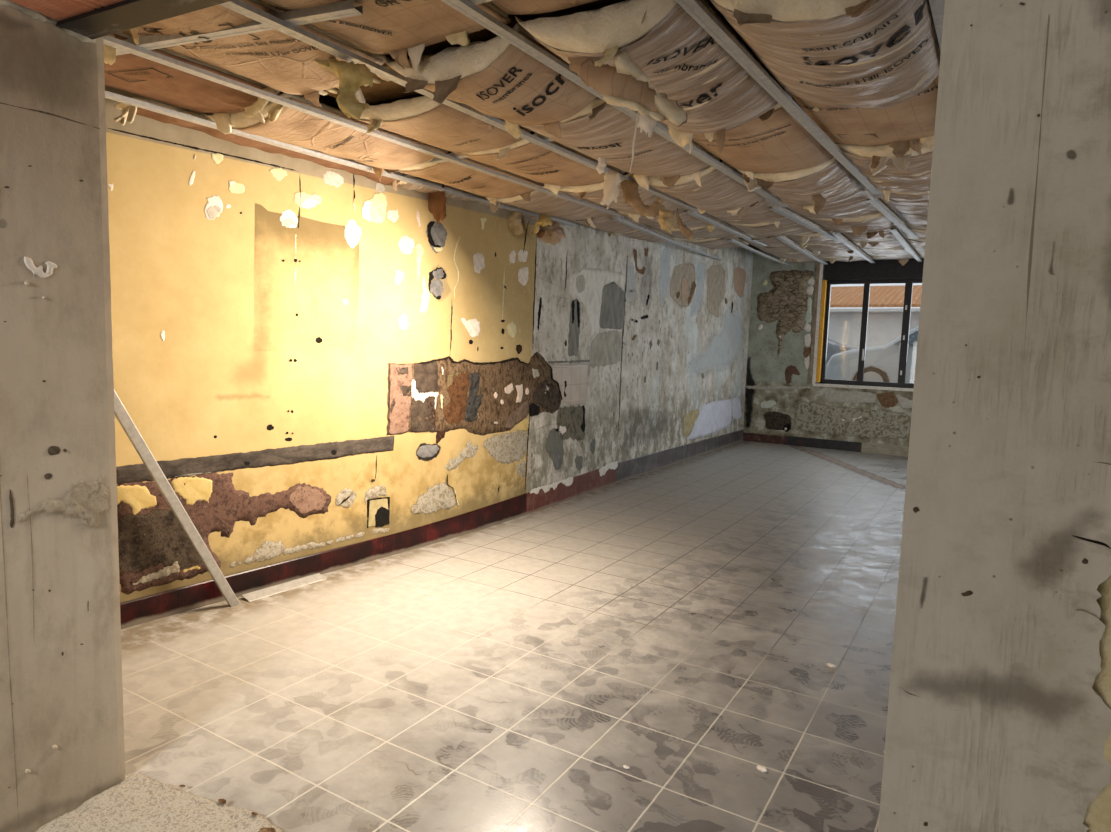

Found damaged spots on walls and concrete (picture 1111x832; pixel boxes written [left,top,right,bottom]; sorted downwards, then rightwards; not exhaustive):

peeling [269,167,287,181]
peeling [279,191,322,228]
peeling [345,183,399,248]
peeling [398,235,415,255]
peeling [473,249,529,286]
spalling [565,282,637,368]
spalling [670,264,746,317]
spalling [757,270,814,357]
spalling [386,318,573,514]
spalling [877,392,898,408]
spalling [117,472,390,595]